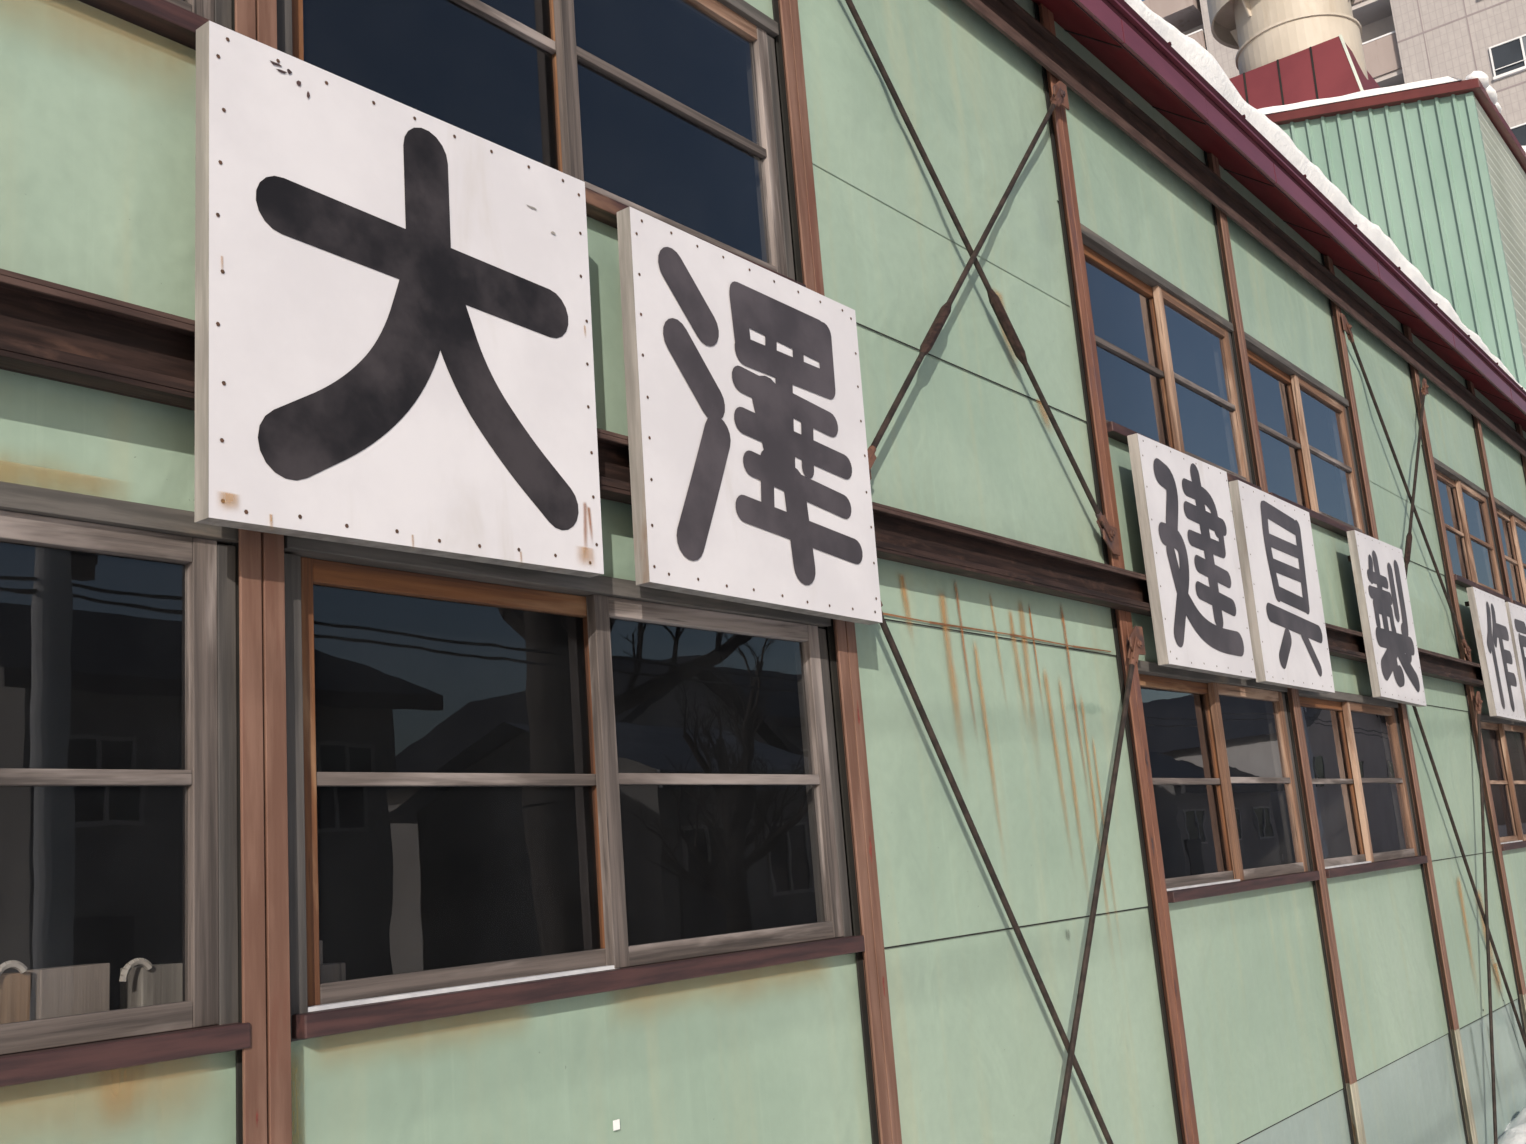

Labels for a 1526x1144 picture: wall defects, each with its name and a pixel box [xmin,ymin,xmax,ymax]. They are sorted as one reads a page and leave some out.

corrosion [941,585,991,754]
corrosion [990,598,1104,848]